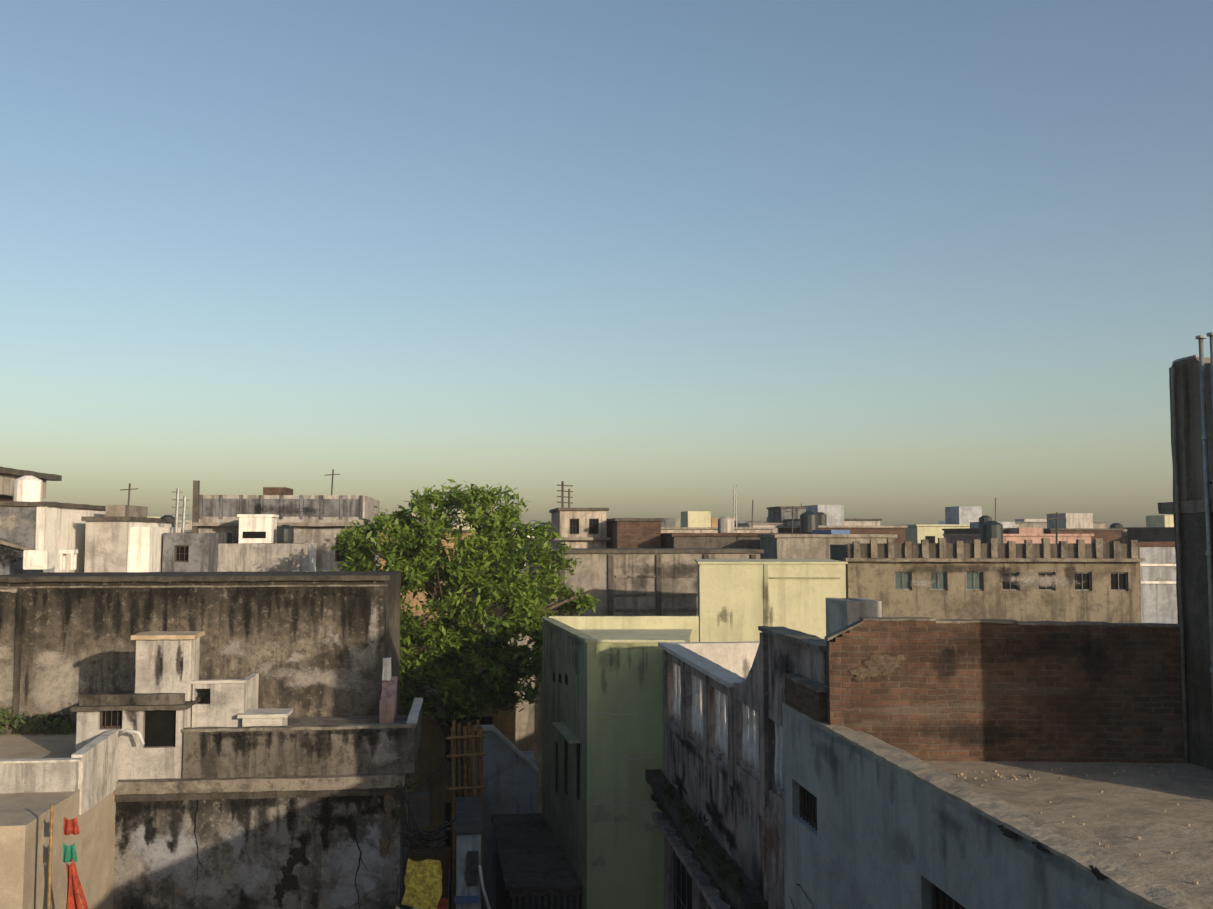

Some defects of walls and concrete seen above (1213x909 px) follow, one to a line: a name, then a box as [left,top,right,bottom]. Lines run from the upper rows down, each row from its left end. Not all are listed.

leakage [0,587,204,635]
leakage [156,647,183,684]
leakage [225,587,378,691]
leakage [126,701,136,731]
peeling [127,821,393,909]
crack [354,832,369,909]